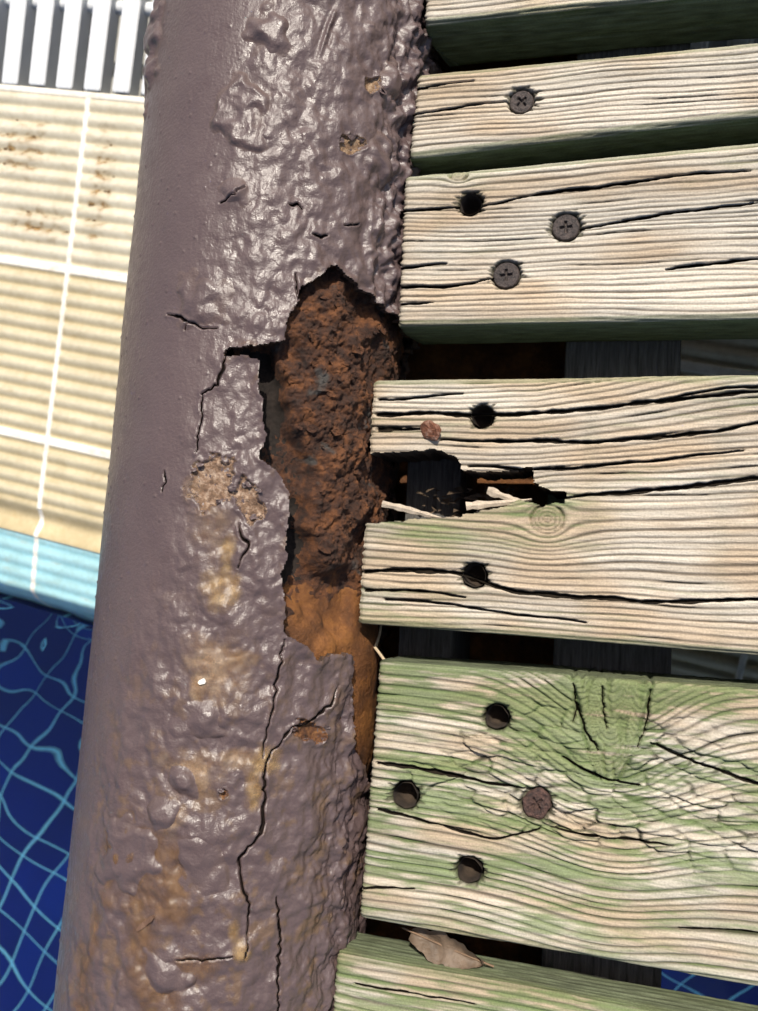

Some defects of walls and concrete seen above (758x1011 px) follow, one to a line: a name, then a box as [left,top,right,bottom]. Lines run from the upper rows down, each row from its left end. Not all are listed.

crack [167,314,218,330]
crack [196,355,226,452]
crack [238,527,250,567]
crack [177,643,336,962]
crack [275,897,283,1011]